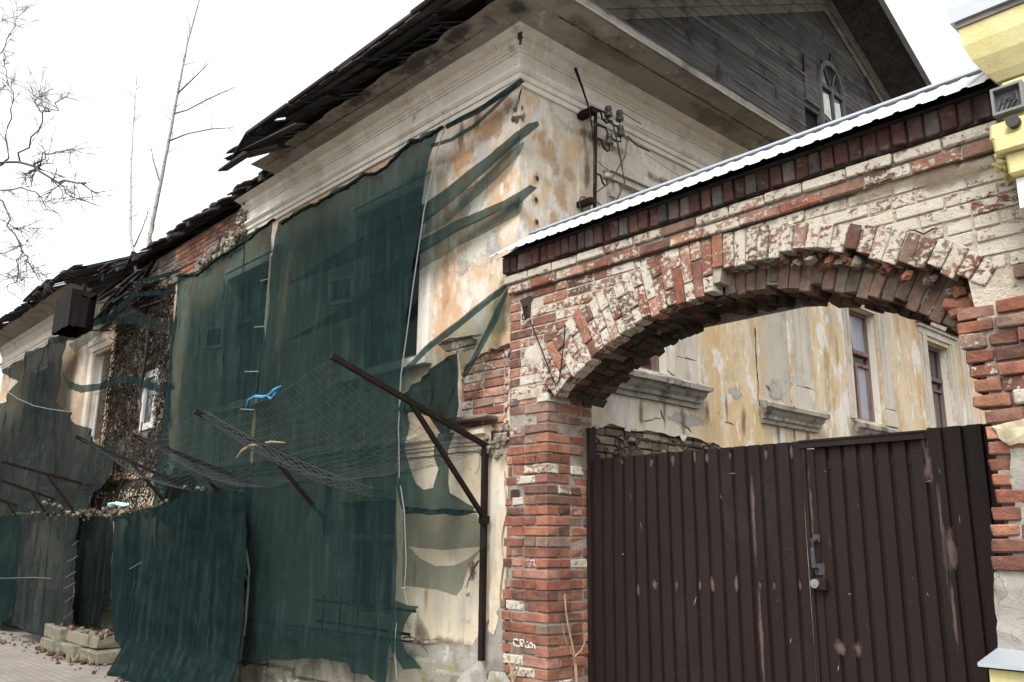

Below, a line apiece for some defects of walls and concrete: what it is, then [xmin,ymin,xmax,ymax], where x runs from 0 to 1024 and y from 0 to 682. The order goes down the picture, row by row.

spalling [511,88,526,124]
damp [450,125,473,173]
peeling [457,176,500,275]
flaking render [131,215,240,306]
spalling [726,249,970,299]
spalling [520,295,533,318]
peeling [525,339,547,368]
damp [824,338,839,378]
flaking render [592,411,731,465]